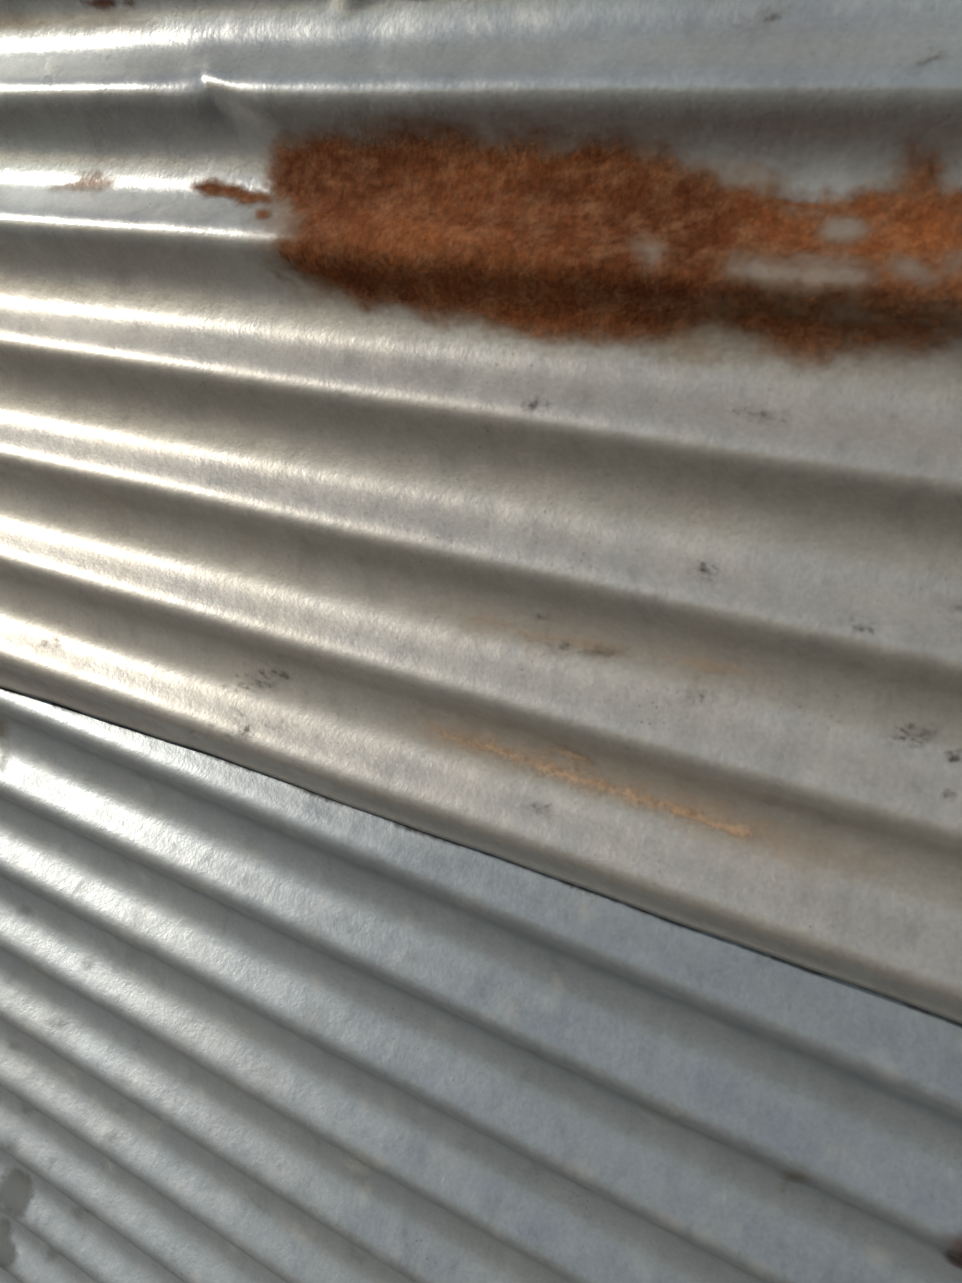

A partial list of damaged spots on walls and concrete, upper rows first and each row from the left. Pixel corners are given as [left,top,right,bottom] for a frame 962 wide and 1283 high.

rust [92,0,130,8]
rust [191,126,962,362]